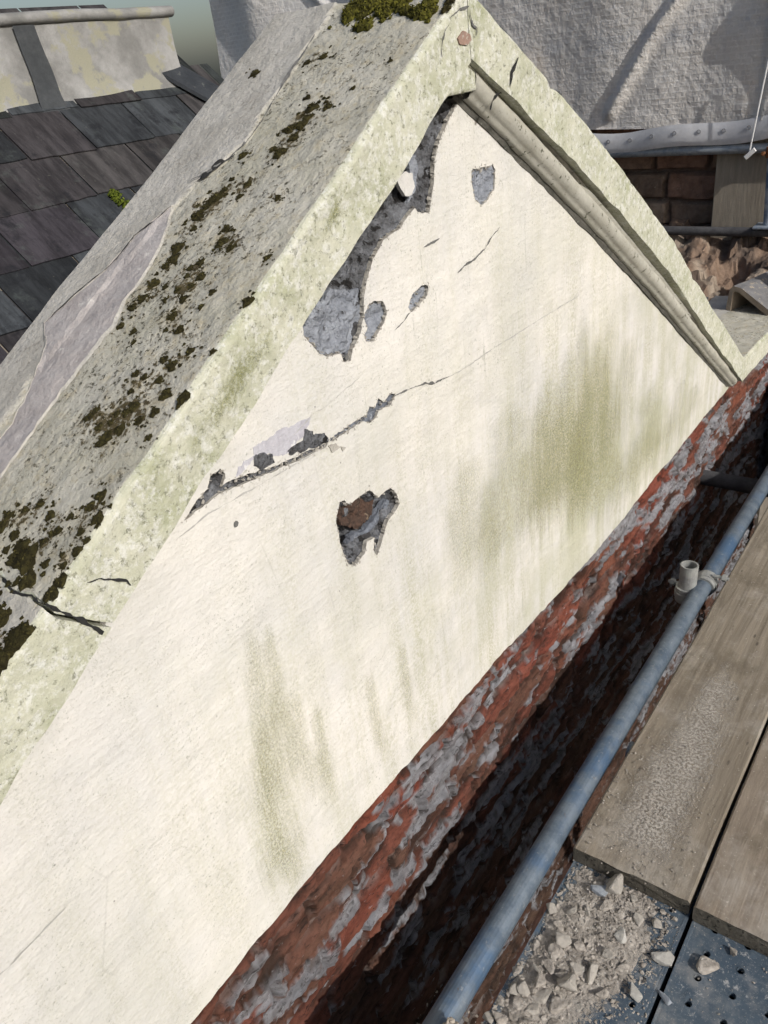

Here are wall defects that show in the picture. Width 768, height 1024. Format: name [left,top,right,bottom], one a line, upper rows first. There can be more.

peeling [471,163,496,207]
spalling [301,94,462,364]
crack [458,227,500,273]
peeling [0,204,174,478]
crack [180,296,578,537]
spalling [335,485,400,567]
crack [2,577,104,635]
crack [87,577,131,585]